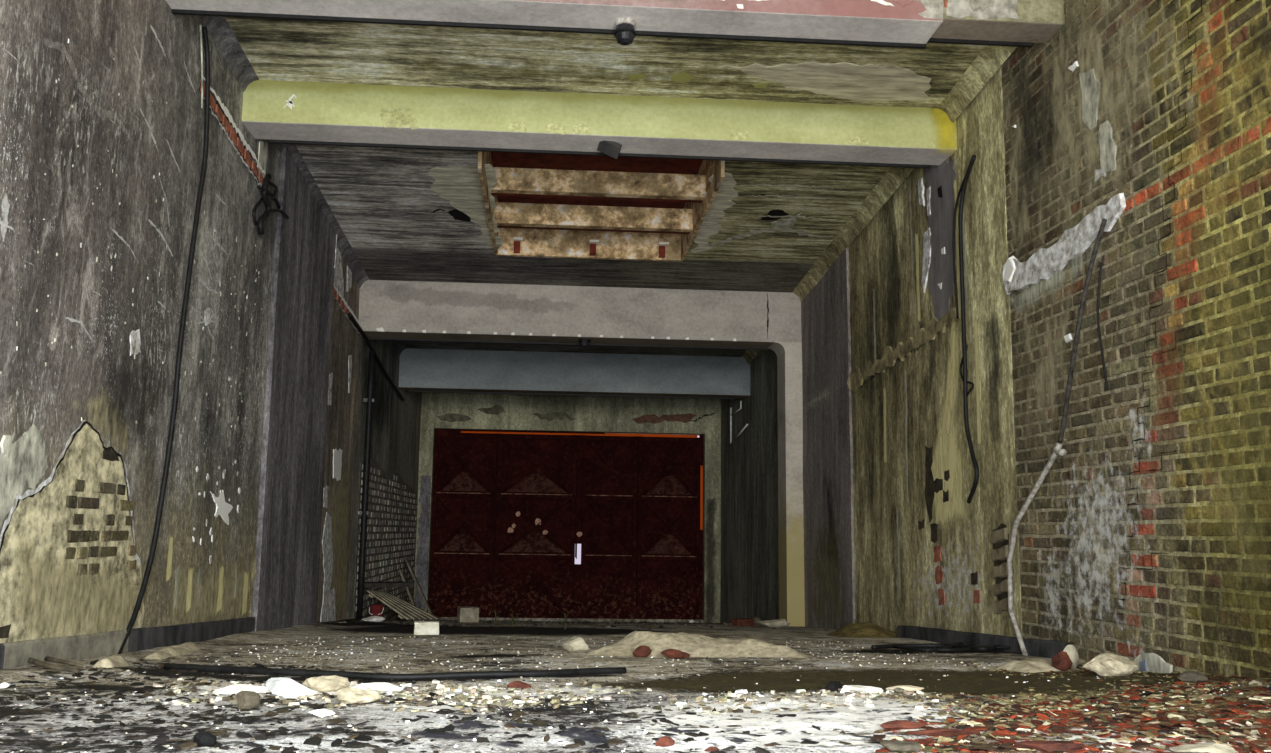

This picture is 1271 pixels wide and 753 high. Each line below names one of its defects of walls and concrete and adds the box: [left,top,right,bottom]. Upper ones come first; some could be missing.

peeling [1095,121,1117,181]
peeling [1003,256,1017,282]
peeling [121,321,141,359]
flaking render [0,392,144,643]
water stain [1048,470,1132,626]